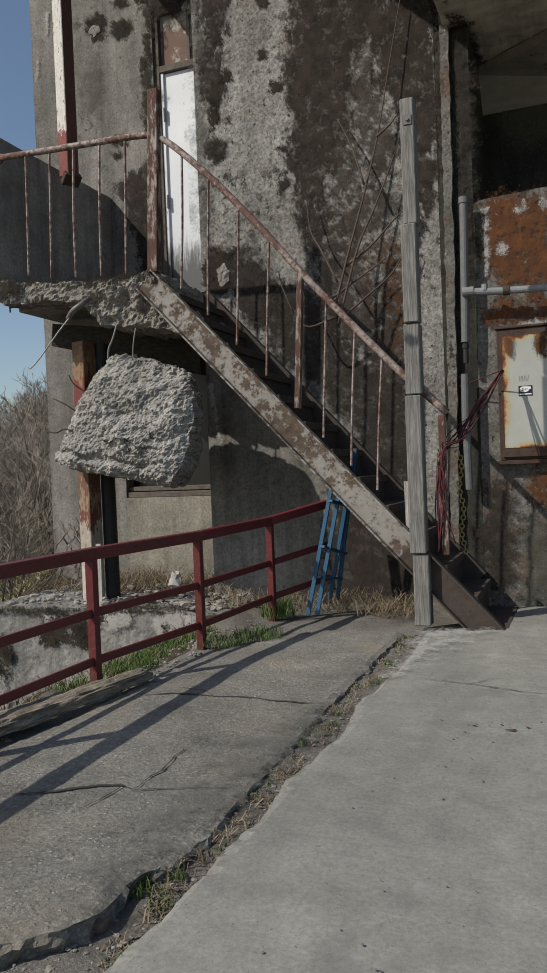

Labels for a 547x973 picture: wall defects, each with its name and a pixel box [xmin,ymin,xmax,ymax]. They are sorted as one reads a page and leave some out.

damp [83,0,238,155]
damp [113,159,162,274]
damp [226,0,484,487]
rust [359,228,406,369]
rust [471,186,547,358]
crack [138,687,320,703]
crack [15,747,225,808]